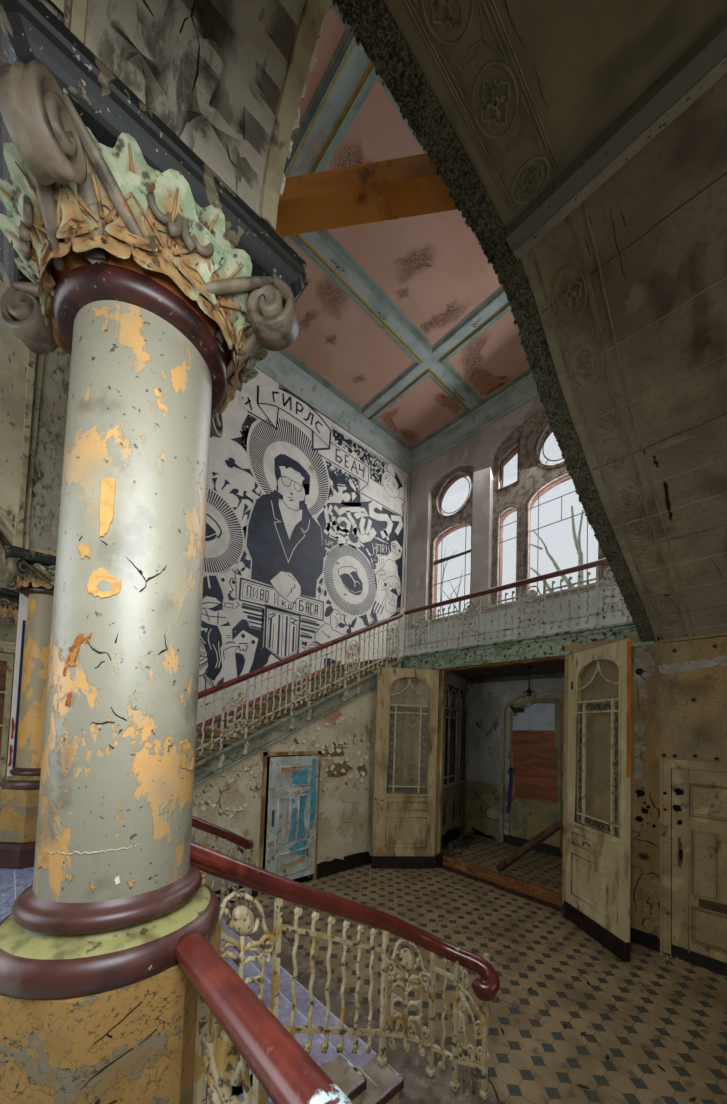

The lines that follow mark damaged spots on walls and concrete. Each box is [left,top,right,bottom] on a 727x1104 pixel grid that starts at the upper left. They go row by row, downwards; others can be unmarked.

crack [179,0,200,102]
spalling [280,52,323,196]
peeling [326,0,727,709]
peeling [99,477,116,538]
peeling [78,544,91,559]
peeling [87,567,122,598]
crack [79,536,166,592]
peeling [63,632,92,677]
crack [86,633,118,668]
peeling [193,710,383,818]
peeling [37,849,48,869]
peeling [81,1029,157,1090]